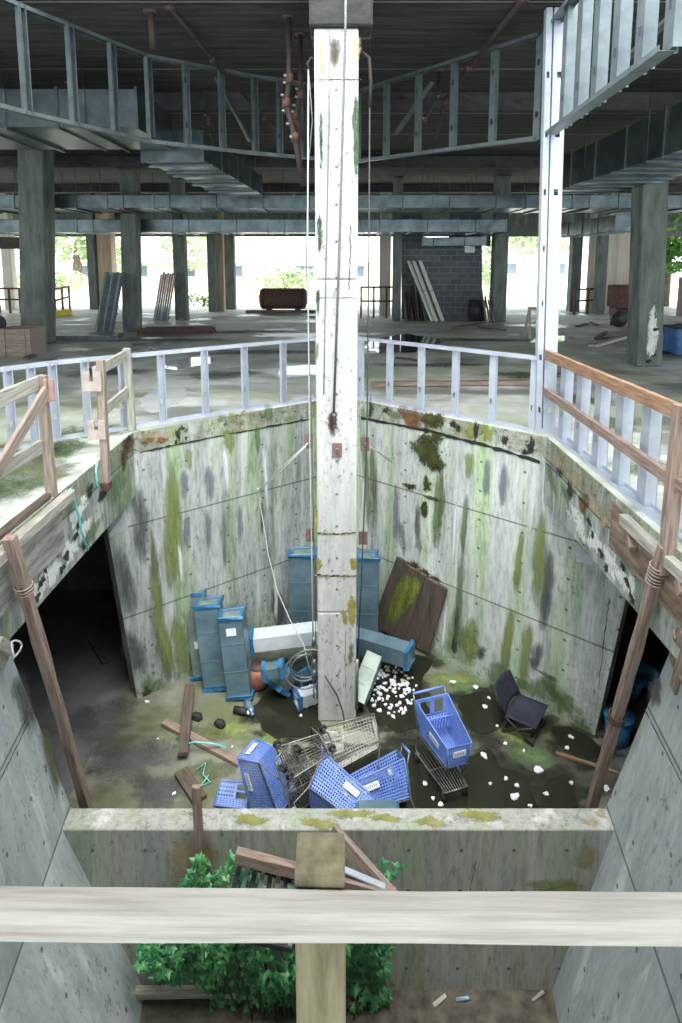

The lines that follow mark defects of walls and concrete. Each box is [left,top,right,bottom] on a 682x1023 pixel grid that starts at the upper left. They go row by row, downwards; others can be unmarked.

peeling [646,300,660,363]
corrosion [399,407,430,429]
corrosion [121,432,170,468]
leakage [222,431,234,489]
leakage [255,429,268,529]
peeling [34,500,94,603]
leakage [114,552,135,607]
leakage [134,450,191,675]
leakage [205,513,226,560]
leakage [488,466,571,685]
peeling [563,498,636,605]
leakage [127,633,144,668]